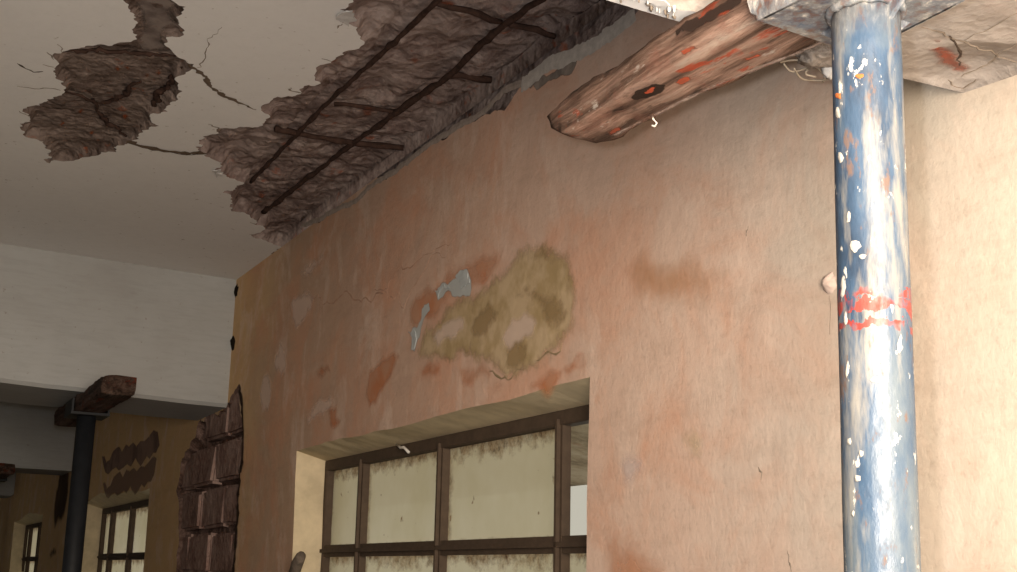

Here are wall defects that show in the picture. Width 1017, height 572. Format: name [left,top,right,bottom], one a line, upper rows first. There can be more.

spalling [17,0,194,163]
crack [126,141,206,155]
crack [188,27,256,110]
spalling [196,0,714,254]
spalling [901,0,1017,93]
peeling [408,245,575,380]
flaking render [102,431,159,498]
flaking render [176,384,244,572]